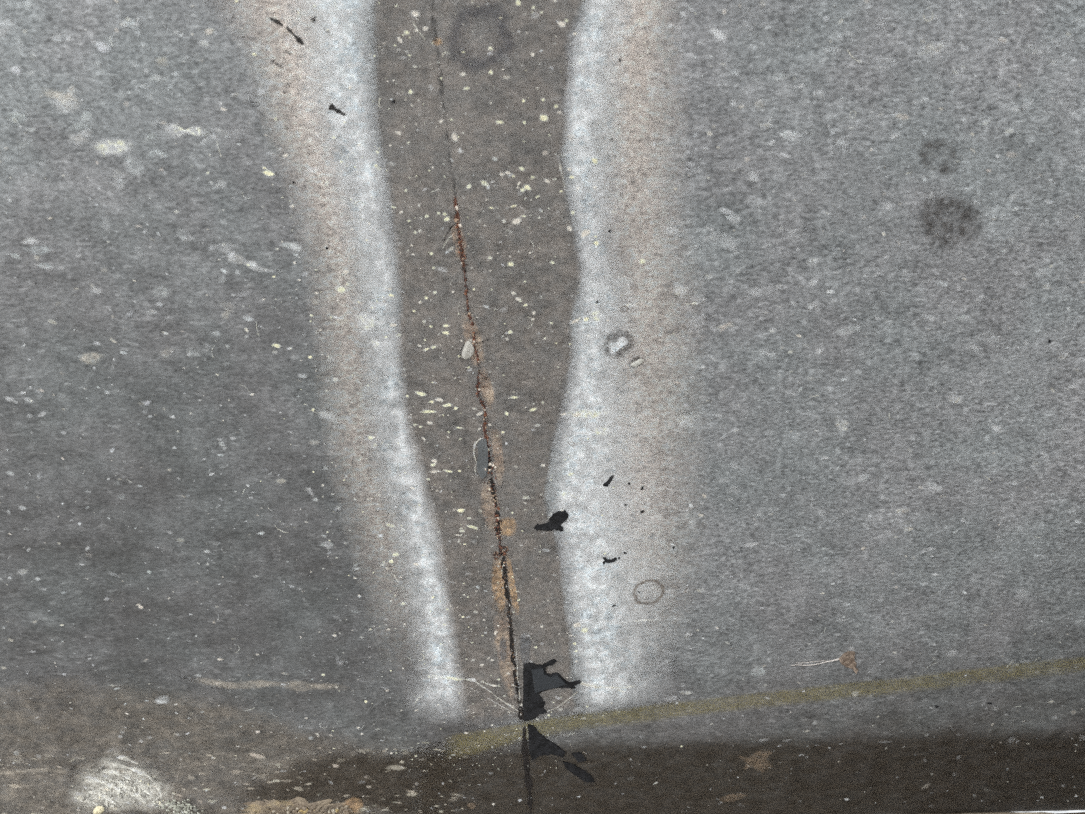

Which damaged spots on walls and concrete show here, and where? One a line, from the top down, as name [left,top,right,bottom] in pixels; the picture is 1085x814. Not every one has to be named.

crack [431,7,446,119]
crack [444,185,533,814]